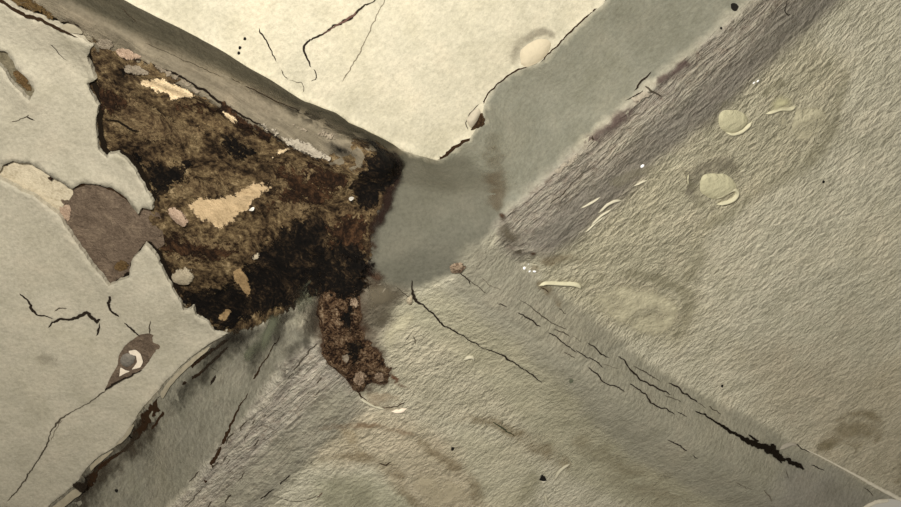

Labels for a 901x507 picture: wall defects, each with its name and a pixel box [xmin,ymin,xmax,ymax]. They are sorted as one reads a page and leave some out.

crack [146,0,385,110]
flaking render [0,0,399,507]
crack [20,294,151,336]
crack [397,281,542,383]
damp [604,287,677,333]
crack [470,278,823,478]
spalling [806,449,901,507]